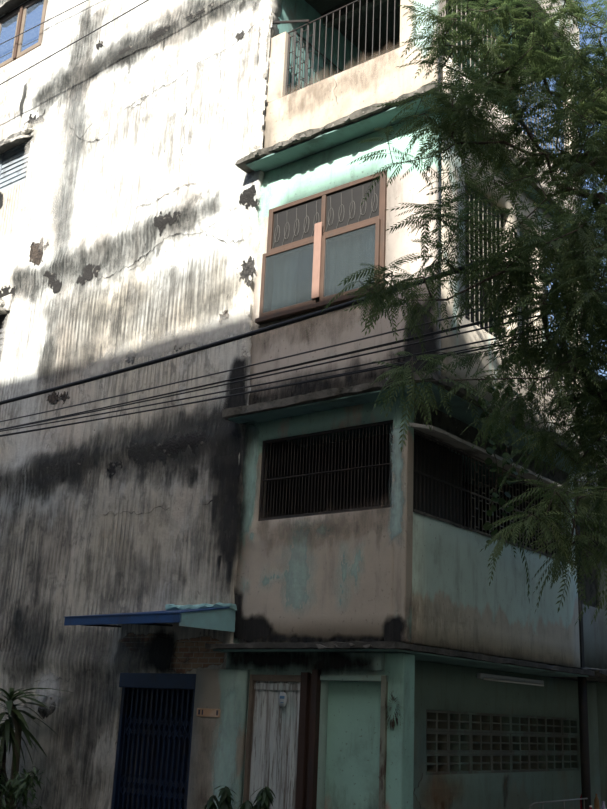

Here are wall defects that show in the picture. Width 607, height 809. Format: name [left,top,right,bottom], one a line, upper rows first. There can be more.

crack [123,24,255,162]
leakage [13,0,250,382]
spalling [154,211,181,236]
spalling [239,185,271,247]
spalling [29,237,62,293]
spalling [76,263,100,286]
spalling [239,256,255,287]
flaking render [0,285,22,362]
spalling [48,391,70,404]
leakage [0,299,438,673]
leakage [0,607,175,752]